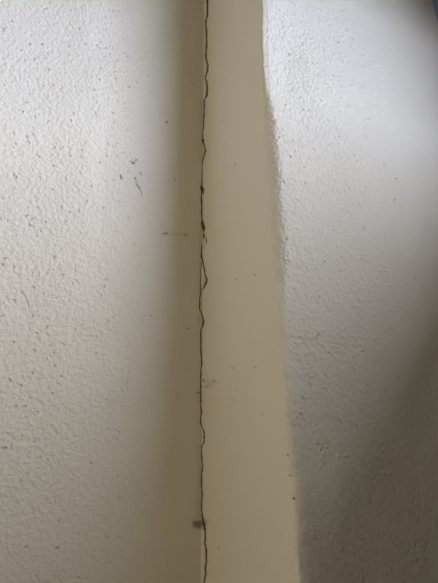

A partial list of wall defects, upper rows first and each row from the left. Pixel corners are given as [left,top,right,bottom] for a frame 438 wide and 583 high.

crack [197,0,209,583]